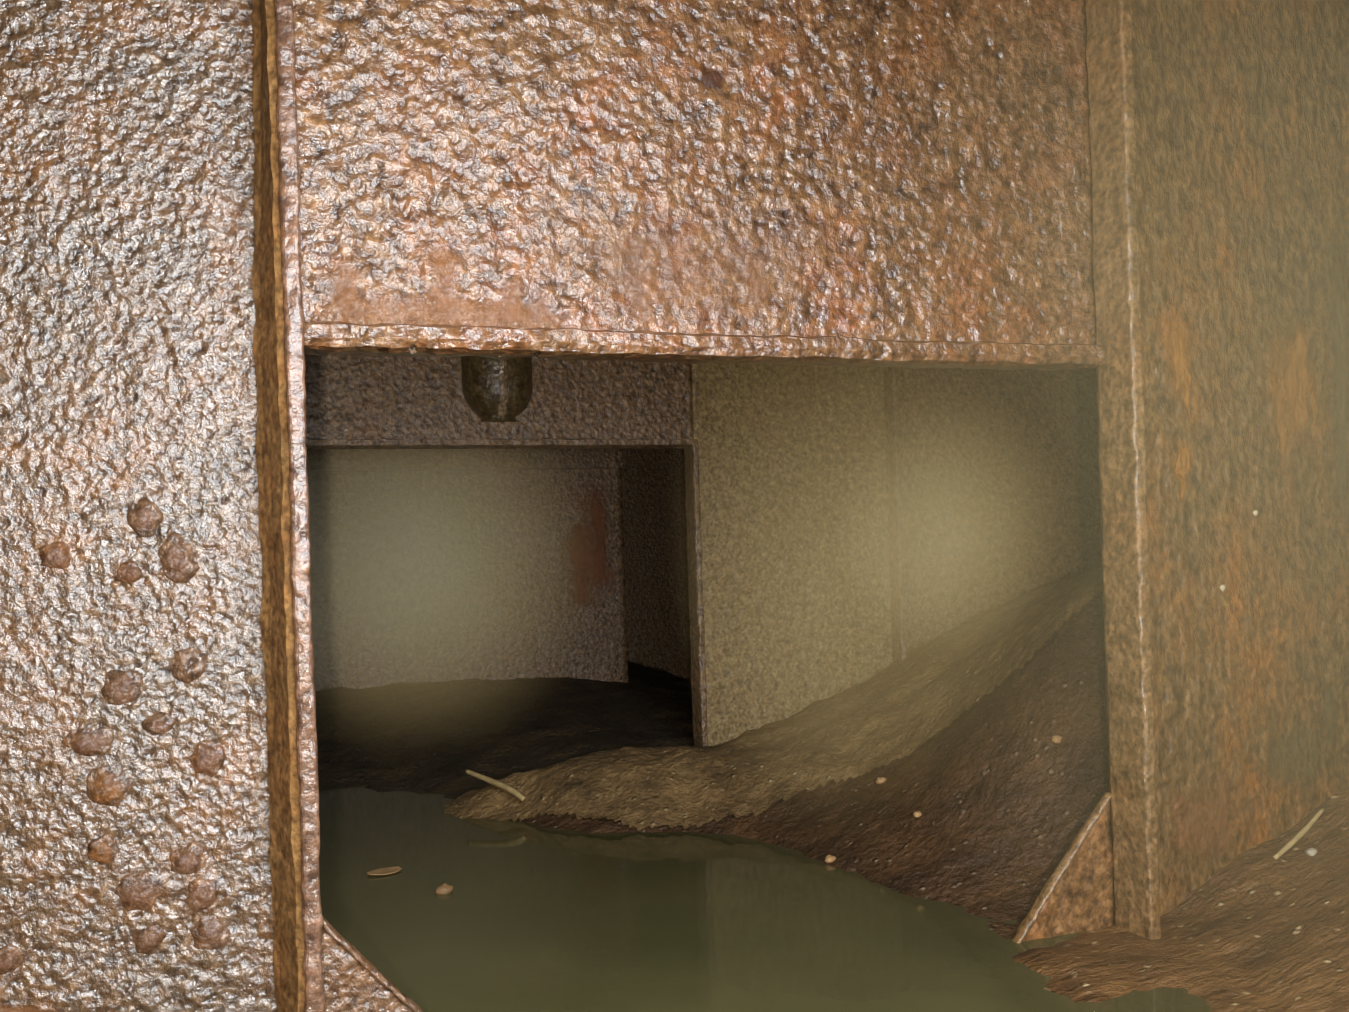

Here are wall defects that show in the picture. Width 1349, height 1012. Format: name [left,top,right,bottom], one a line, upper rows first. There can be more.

corrosion [701,70,722,89]
corrosion [39,541,71,569]
corrosion [115,560,143,584]
corrosion [126,497,200,584]
corrosion [168,648,207,684]
corrosion [101,669,143,705]
corrosion [141,711,176,735]
corrosion [61,726,135,806]
corrosion [189,739,226,778]
corrosion [87,833,118,865]
corrosion [115,842,231,955]
corrosion [0,944,23,974]